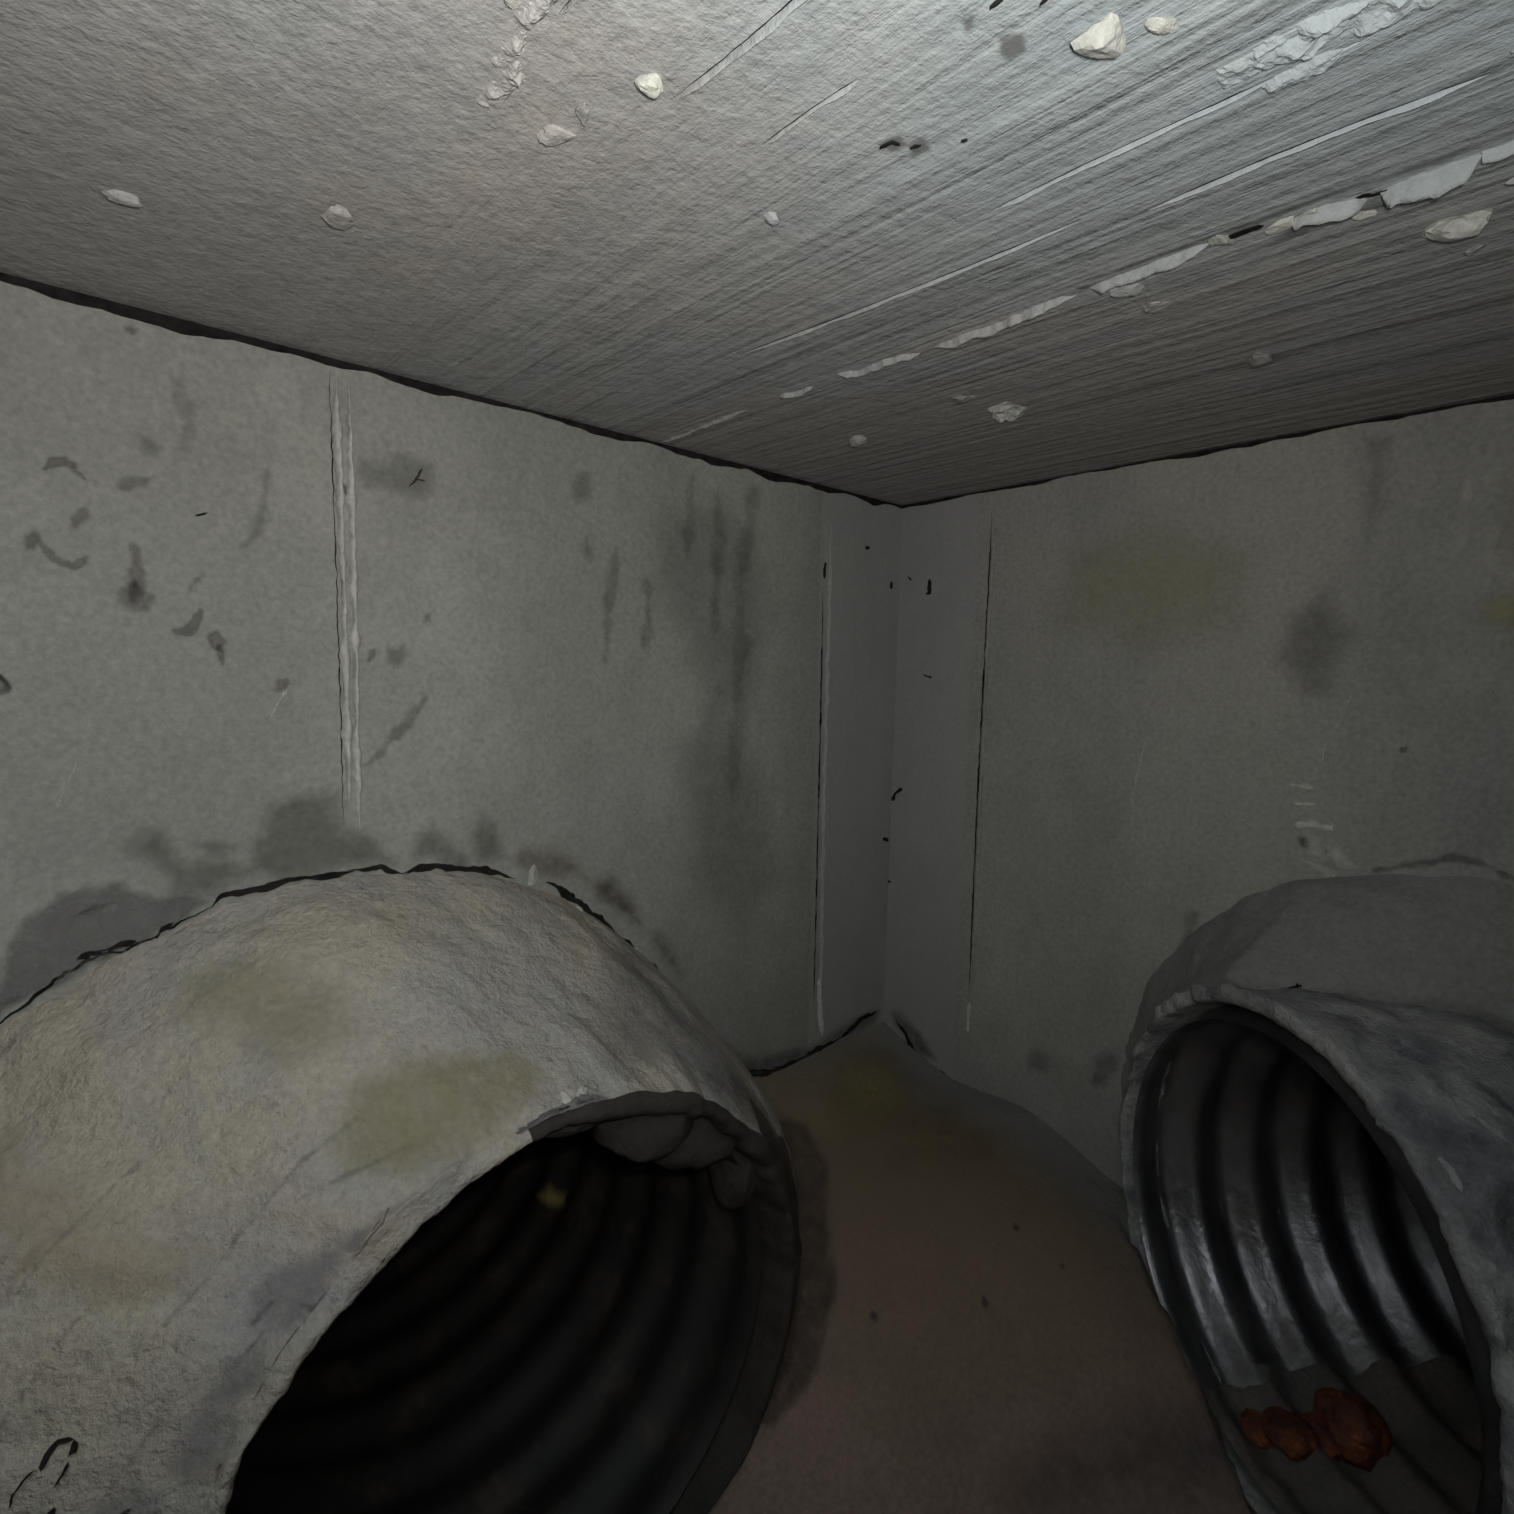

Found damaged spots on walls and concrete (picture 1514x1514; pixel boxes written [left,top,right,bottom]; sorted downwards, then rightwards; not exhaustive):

spalling [1002,35,1025,57]
spalling [1071,12,1126,59]
spalling [1144,16,1177,35]
spalling [1216,0,1444,93]
peeling [1265,208,1319,235]
peeling [1351,210,1378,220]
spalling [1422,208,1493,256]
corrosion [1240,1387,1394,1472]